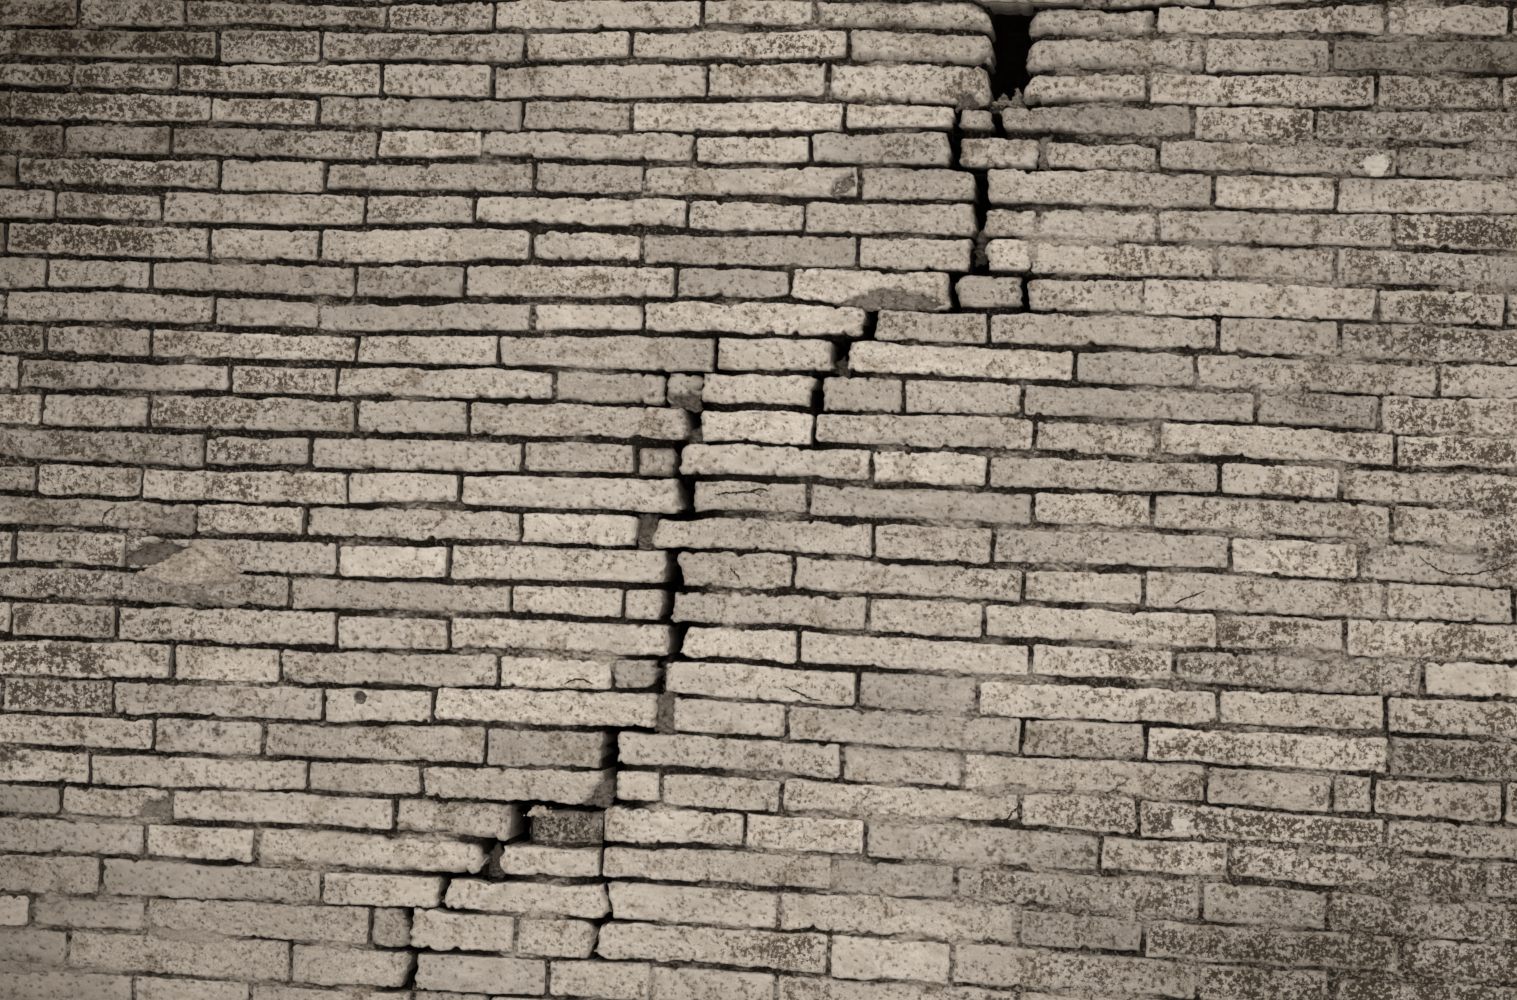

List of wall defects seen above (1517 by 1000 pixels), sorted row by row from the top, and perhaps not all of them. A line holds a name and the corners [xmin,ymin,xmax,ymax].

crack [1078,0,1159,13]
crack [811,7,1052,447]
crack [407,337,769,1000]
crack [785,687,822,701]
crack [986,802,1022,827]